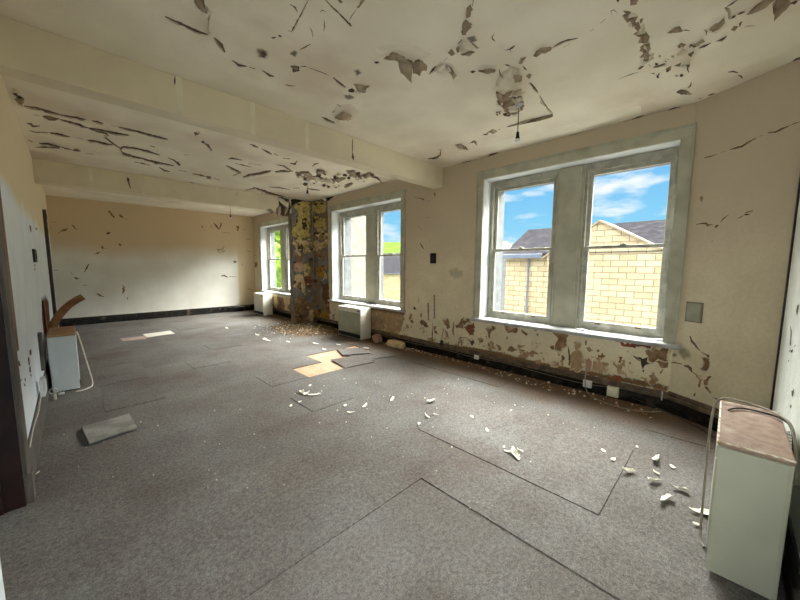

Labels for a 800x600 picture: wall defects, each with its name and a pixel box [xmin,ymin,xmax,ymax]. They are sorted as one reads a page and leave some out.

peeling [194,0,212,14]
peeling [374,0,478,83]
peeling [611,0,798,78]
peeling [291,66,369,123]
peeling [483,38,577,135]
peeling [120,145,182,172]
peeling [267,170,382,324]
peeling [442,318,605,373]
peeling [616,336,717,400]